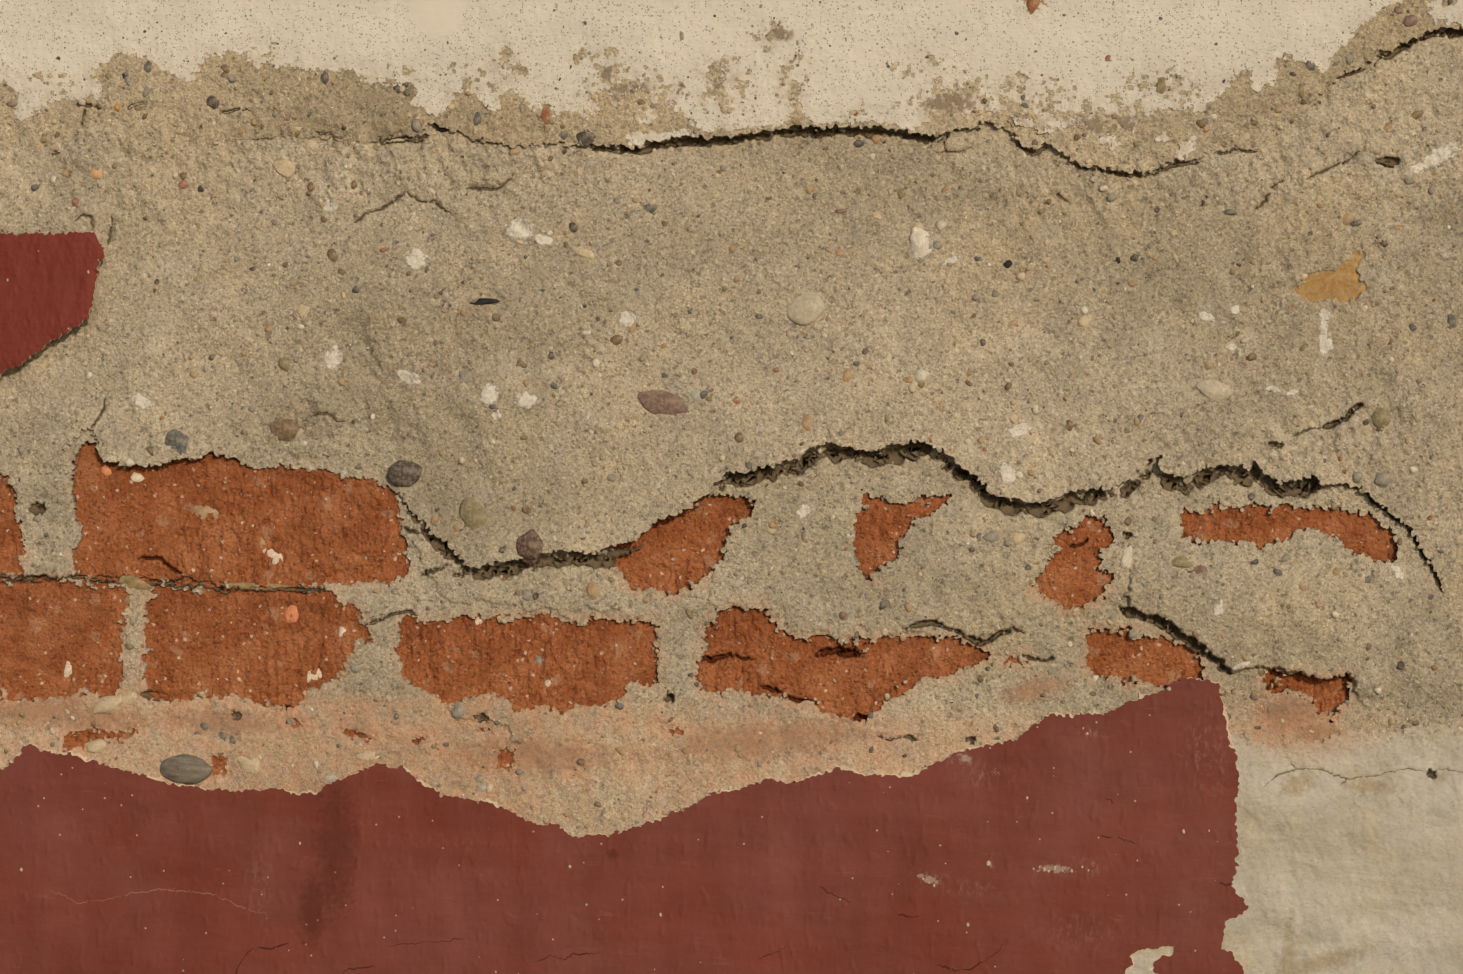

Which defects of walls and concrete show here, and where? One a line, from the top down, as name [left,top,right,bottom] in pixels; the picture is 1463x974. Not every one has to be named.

crack [1337,29,1463,79]
crack [589,128,948,155]
crack [1015,140,1258,203]
crack [1254,151,1360,210]
spalling [0,26,1463,617]
crack [403,503,645,580]
crack [719,441,1443,593]
crack [0,556,325,594]
crack [366,610,416,625]
crack [1120,607,1232,674]
spalling [0,405,1463,974]